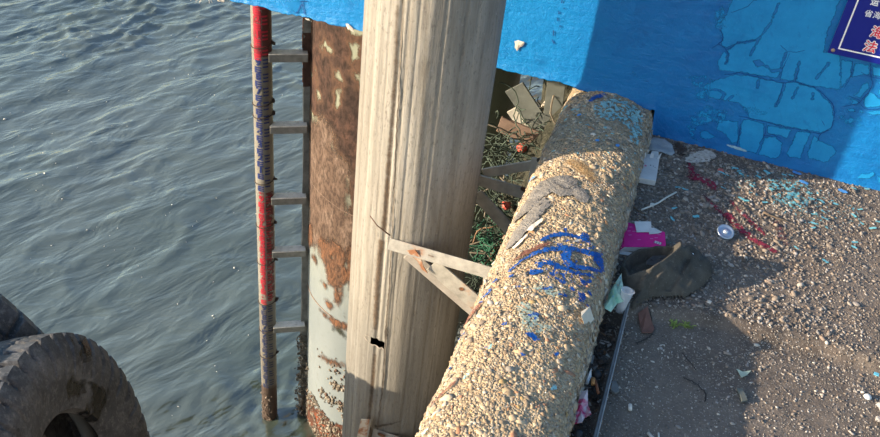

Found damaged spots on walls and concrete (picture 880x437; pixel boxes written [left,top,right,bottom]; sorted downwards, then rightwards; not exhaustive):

peeling [700,0,880,162]
crack [714,0,880,144]
rust [308,19,362,330]
rust [306,400,343,437]